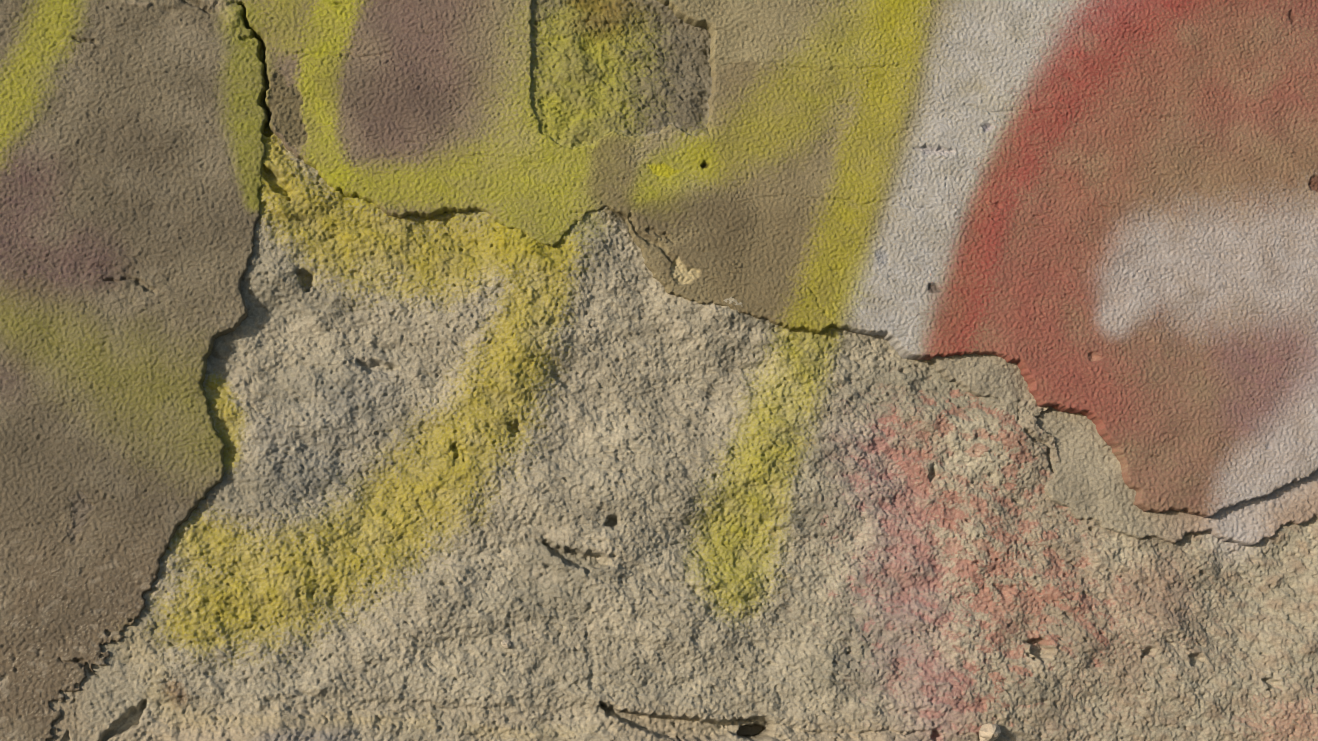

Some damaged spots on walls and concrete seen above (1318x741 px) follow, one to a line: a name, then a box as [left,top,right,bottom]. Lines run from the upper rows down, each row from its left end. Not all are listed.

crack [240,8,272,137]
spalling [622,0,713,136]
spalling [46,212,1318,741]
crack [600,703,926,741]